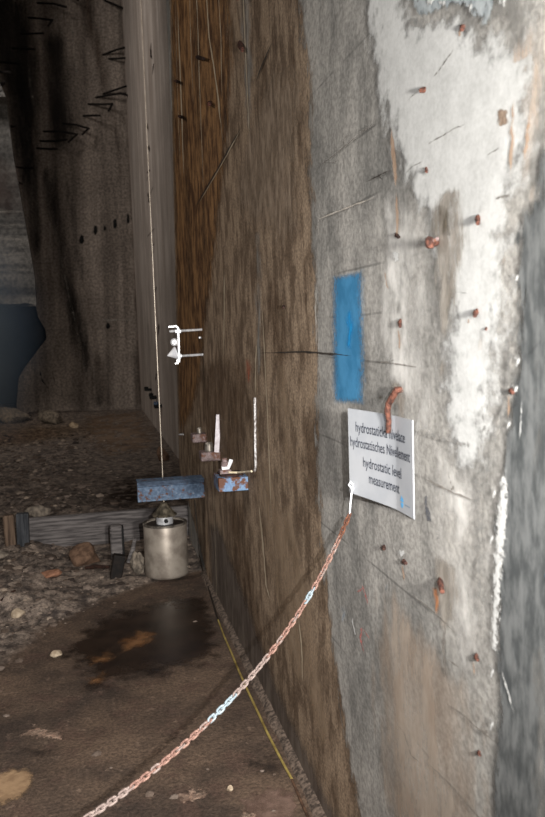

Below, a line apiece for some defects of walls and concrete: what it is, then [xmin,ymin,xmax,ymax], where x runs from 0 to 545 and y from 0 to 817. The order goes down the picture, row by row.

water stain [67,288,88,367]
water stain [177,0,361,817]
water stain [103,481,138,507]